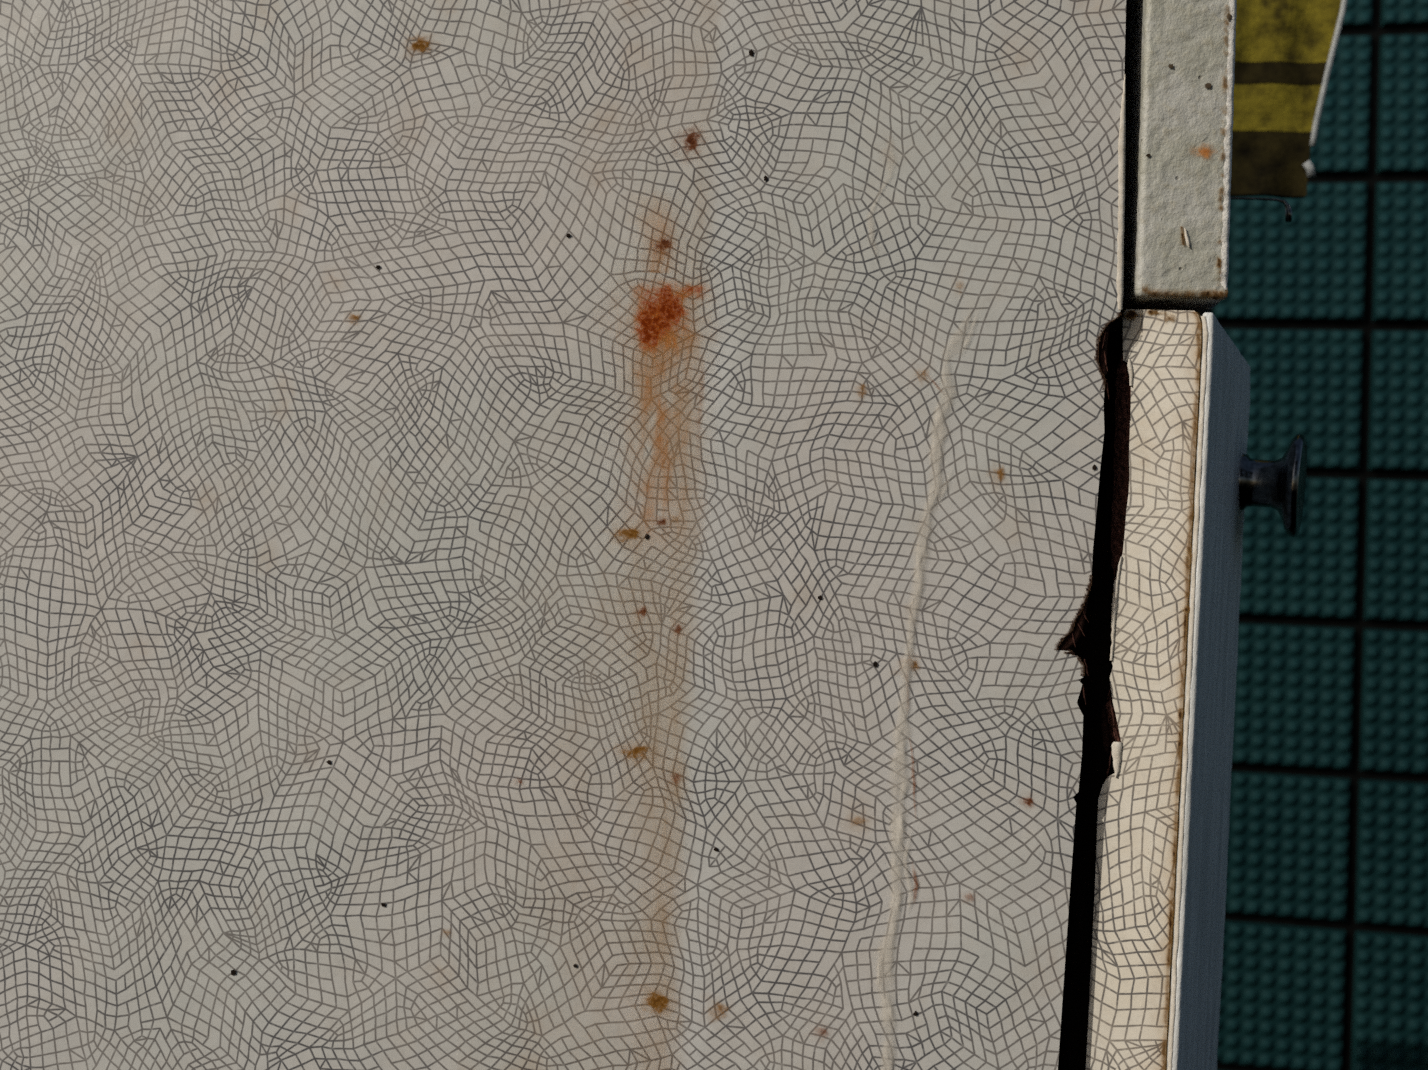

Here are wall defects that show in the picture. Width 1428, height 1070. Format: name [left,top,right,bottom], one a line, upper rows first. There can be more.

rust [412,38,429,52]
rust [685,132,699,150]
rust [637,285,700,465]
rust [618,529,639,542]
peeling [1054,575,1092,704]
rust [623,746,647,758]
rust [647,992,668,1013]